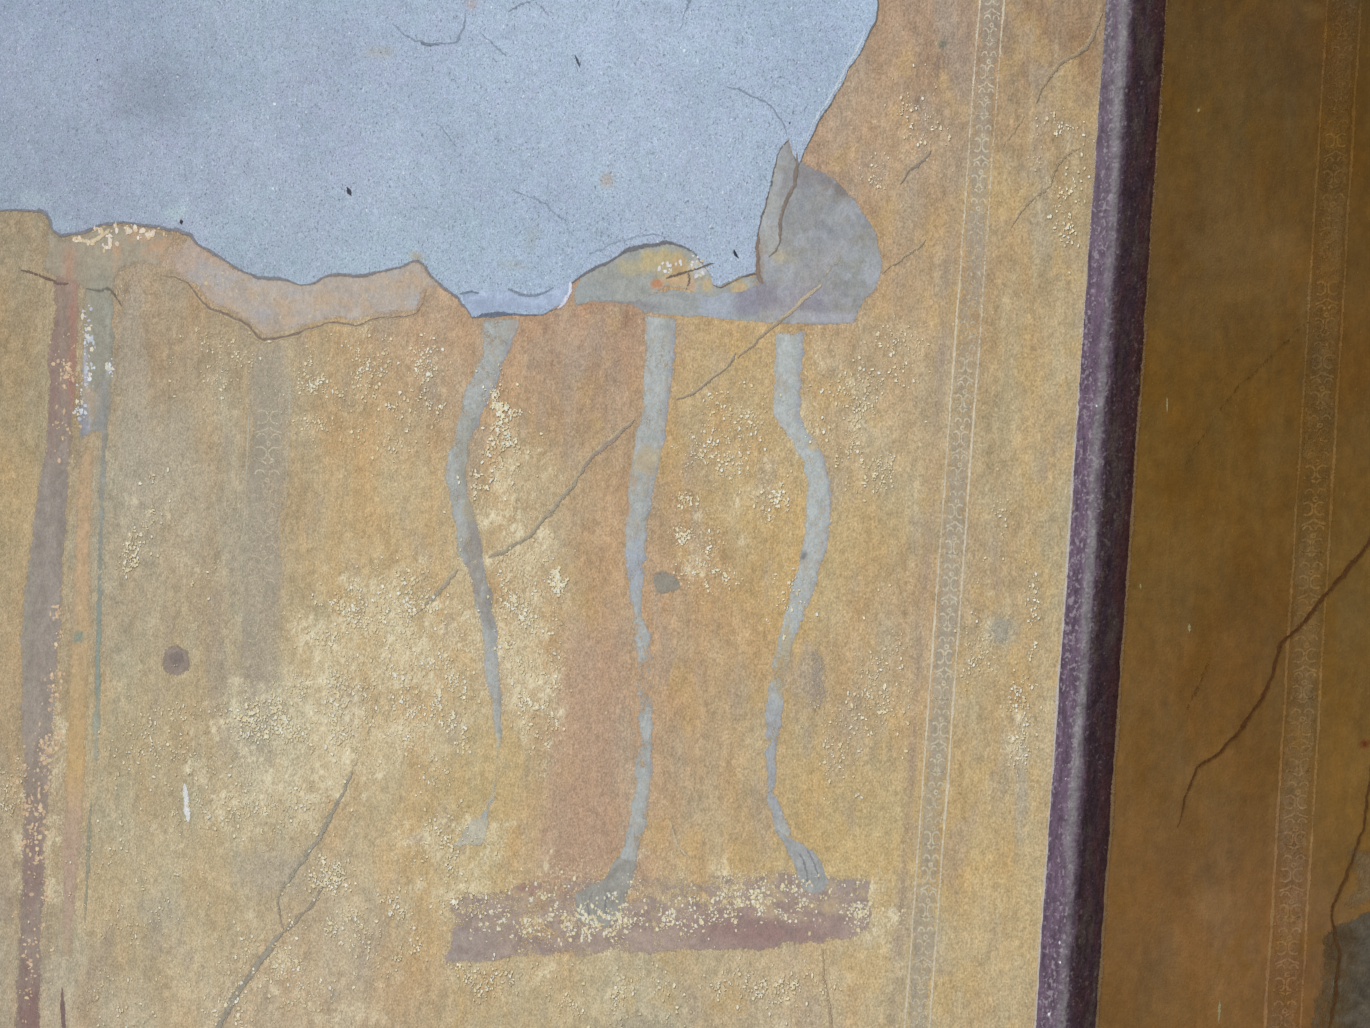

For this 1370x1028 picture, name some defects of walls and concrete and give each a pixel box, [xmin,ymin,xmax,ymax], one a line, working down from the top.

crack [392,0,549,56]
crack [676,256,841,400]
crack [215,419,635,1028]
crack [1177,538,1370,828]
crack [1329,768,1370,1028]